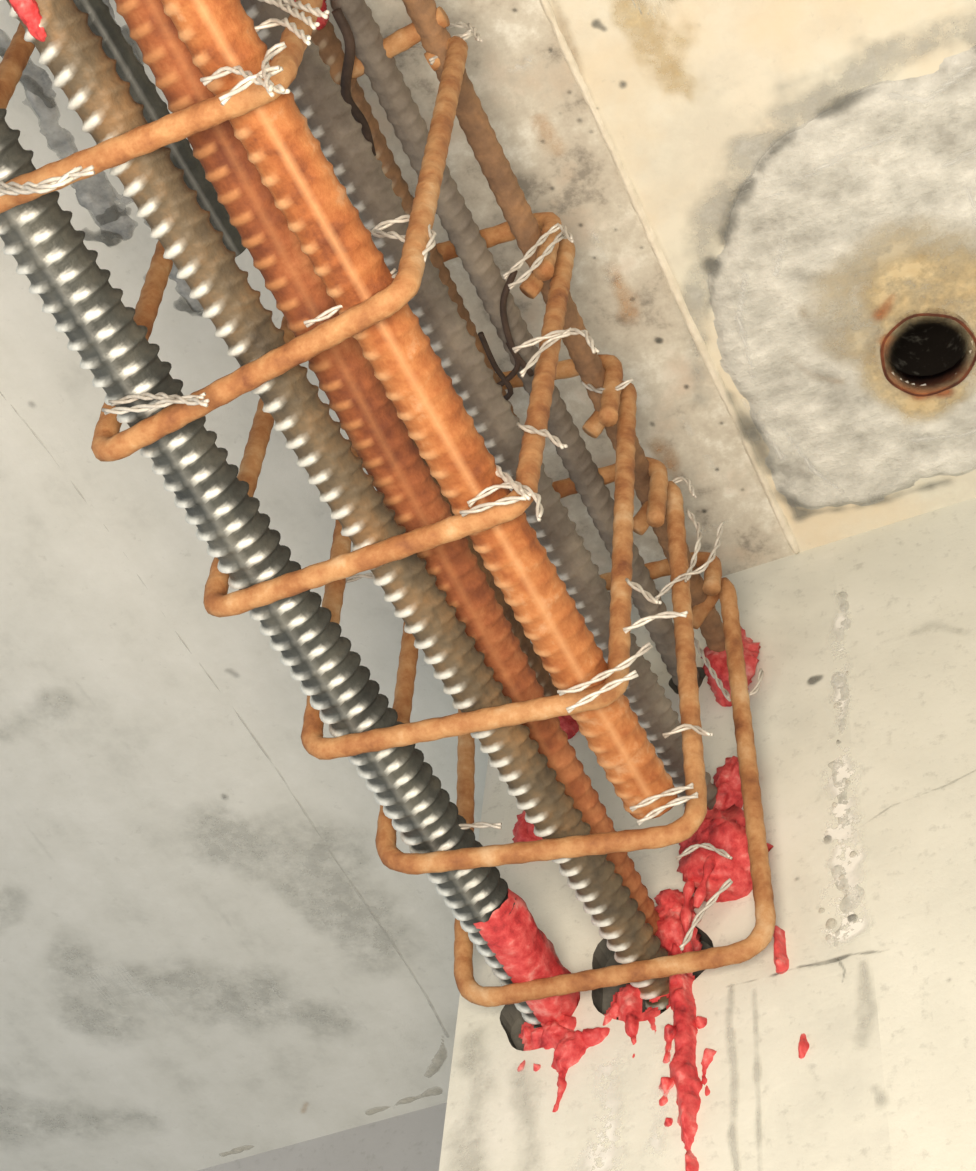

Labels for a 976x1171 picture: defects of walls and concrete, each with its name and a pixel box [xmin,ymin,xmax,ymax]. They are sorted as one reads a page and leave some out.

damp [819,95,857,117]
damp [721,183,750,243]
damp [704,258,719,275]
rust [820,228,976,417]
damp [740,417,772,473]
damp [786,498,813,519]